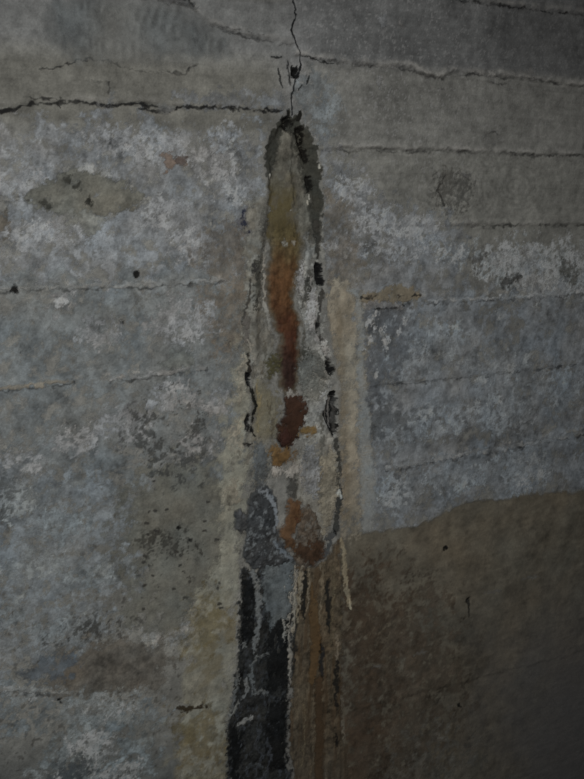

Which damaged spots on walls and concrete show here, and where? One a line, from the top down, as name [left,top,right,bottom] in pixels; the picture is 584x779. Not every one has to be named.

crack [0,0,334,115]
spalling [264,109,324,248]
water stain [0,107,350,779]
rust [279,496,303,552]
rust [266,222,317,478]
water stain [287,68,584,779]